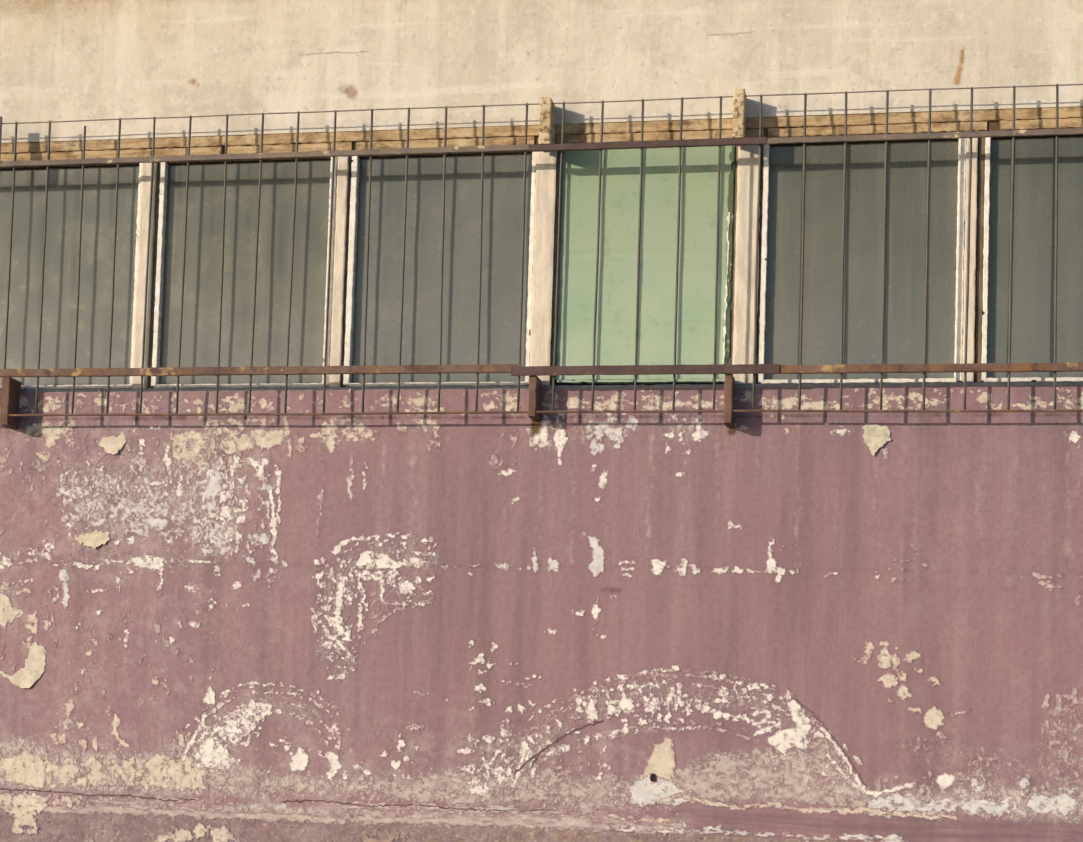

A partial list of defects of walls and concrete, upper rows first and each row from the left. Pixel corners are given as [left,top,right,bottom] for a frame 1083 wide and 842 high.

peeling [0,386,1083,842]
crack [513,720,603,776]
crack [0,788,198,802]
crack [282,800,557,812]